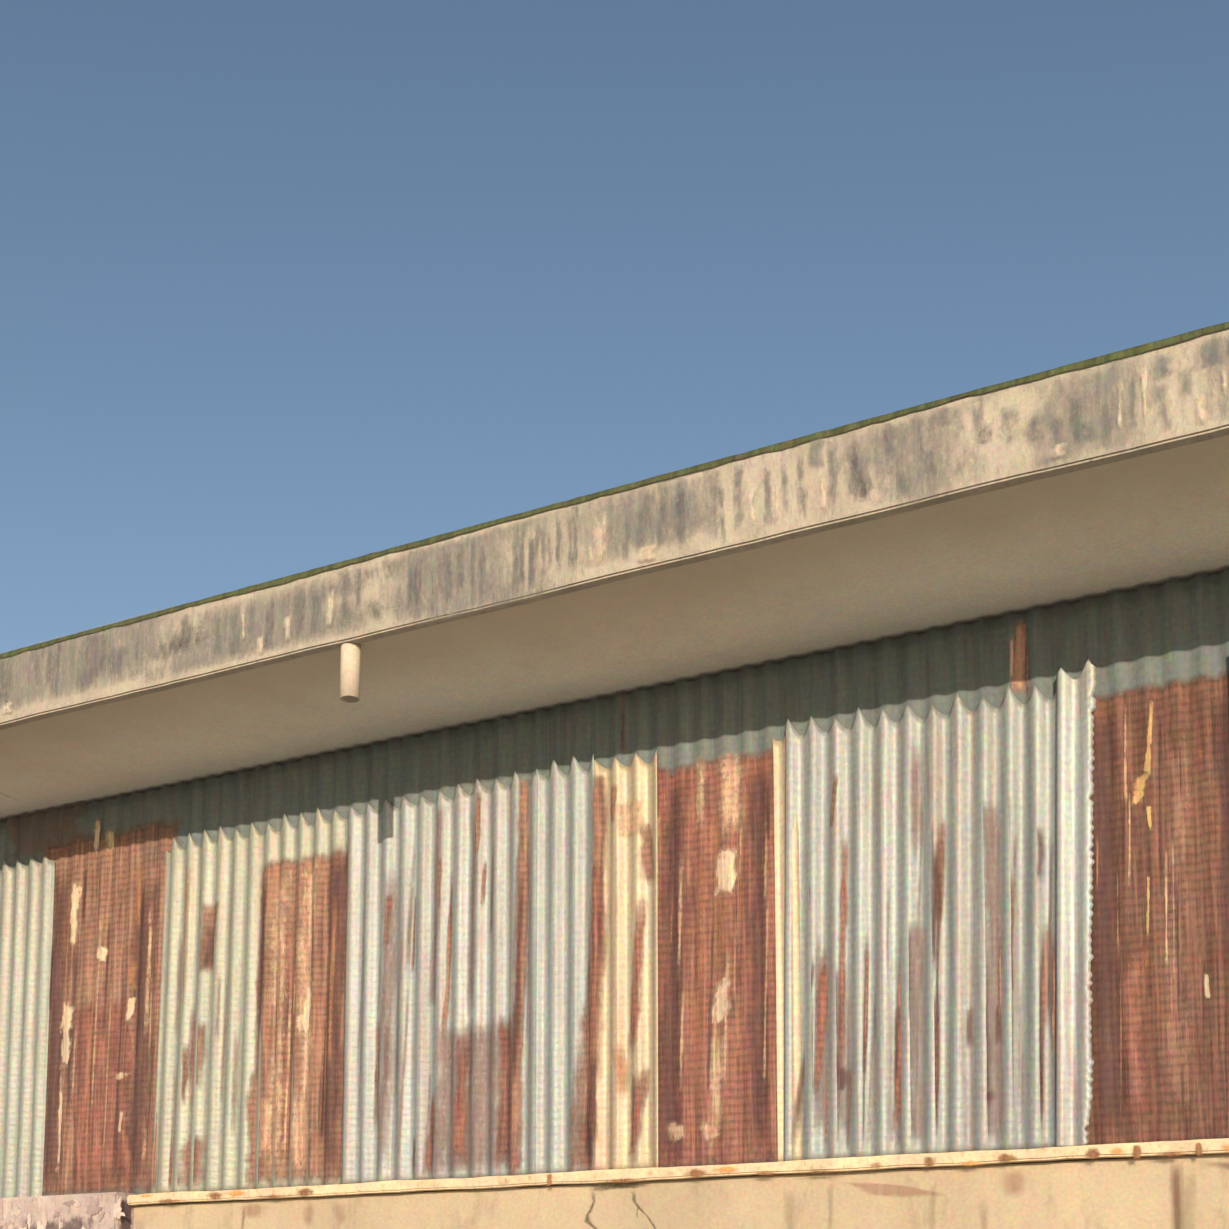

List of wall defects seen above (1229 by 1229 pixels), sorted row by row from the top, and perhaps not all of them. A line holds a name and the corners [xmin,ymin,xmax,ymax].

water stain [1031,366,1134,452]
water stain [374,522,577,615]
water stain [593,486,723,549]
water stain [766,442,835,509]
water stain [0,577,359,704]
rust [43,820,348,1203]
rust [413,782,530,1173]
rust [570,752,778,1177]
rust [894,825,945,1132]
rust [1085,674,1229,1159]
peeling [0,1195,132,1229]
crack [585,1185,656,1229]